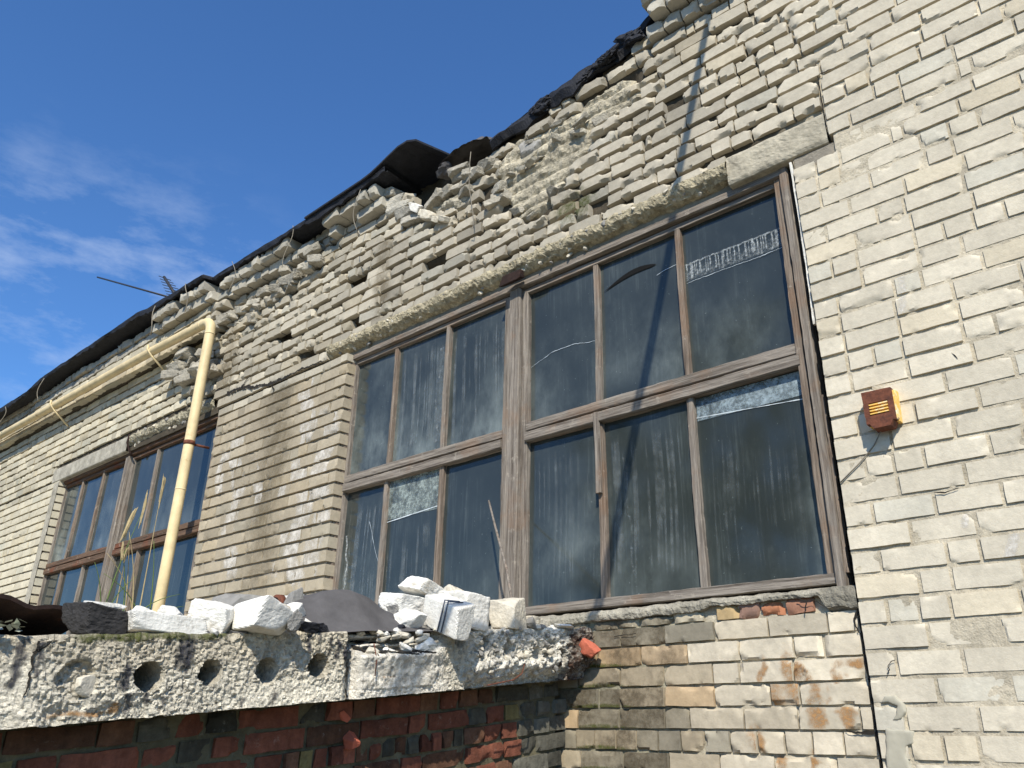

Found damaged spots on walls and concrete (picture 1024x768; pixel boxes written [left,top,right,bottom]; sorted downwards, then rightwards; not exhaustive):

spalling [483,80,642,223]
spalling [326,161,729,360]
water stain [276,380,337,444]
water stain [215,422,333,535]
water stain [224,547,237,574]
water stain [280,486,330,584]
spalling [468,631,564,686]
rust [771,661,855,728]